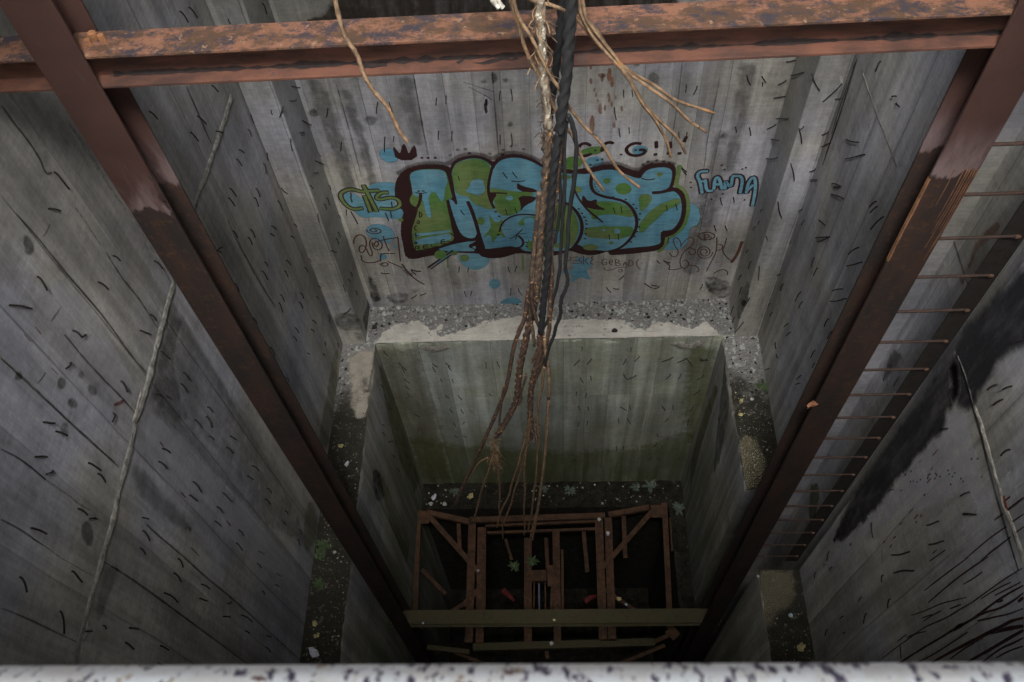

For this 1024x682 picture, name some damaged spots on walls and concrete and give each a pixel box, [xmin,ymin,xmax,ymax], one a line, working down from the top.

corrosion [113,52,553,77]
corrosion [574,29,1004,132]
damp [833,270,1024,541]